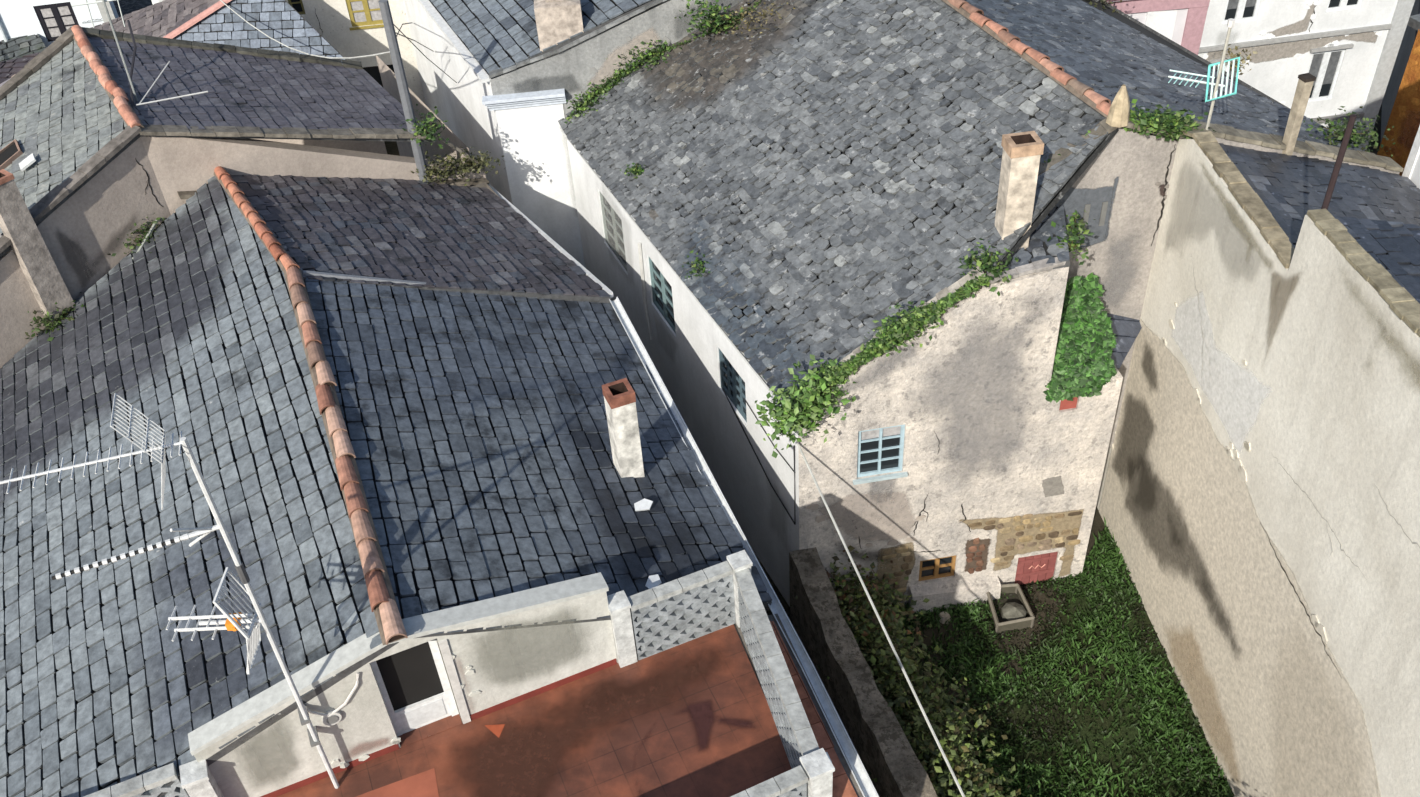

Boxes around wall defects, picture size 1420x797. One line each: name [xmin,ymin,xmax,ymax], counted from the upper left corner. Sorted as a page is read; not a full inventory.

crack [135,158,163,207]
water stain [932,330,1023,468]
water stain [1143,352,1156,386]
water stain [1115,399,1235,648]
flaking render [1099,319,1380,797]
water stain [486,616,577,679]
water stain [462,654,752,797]